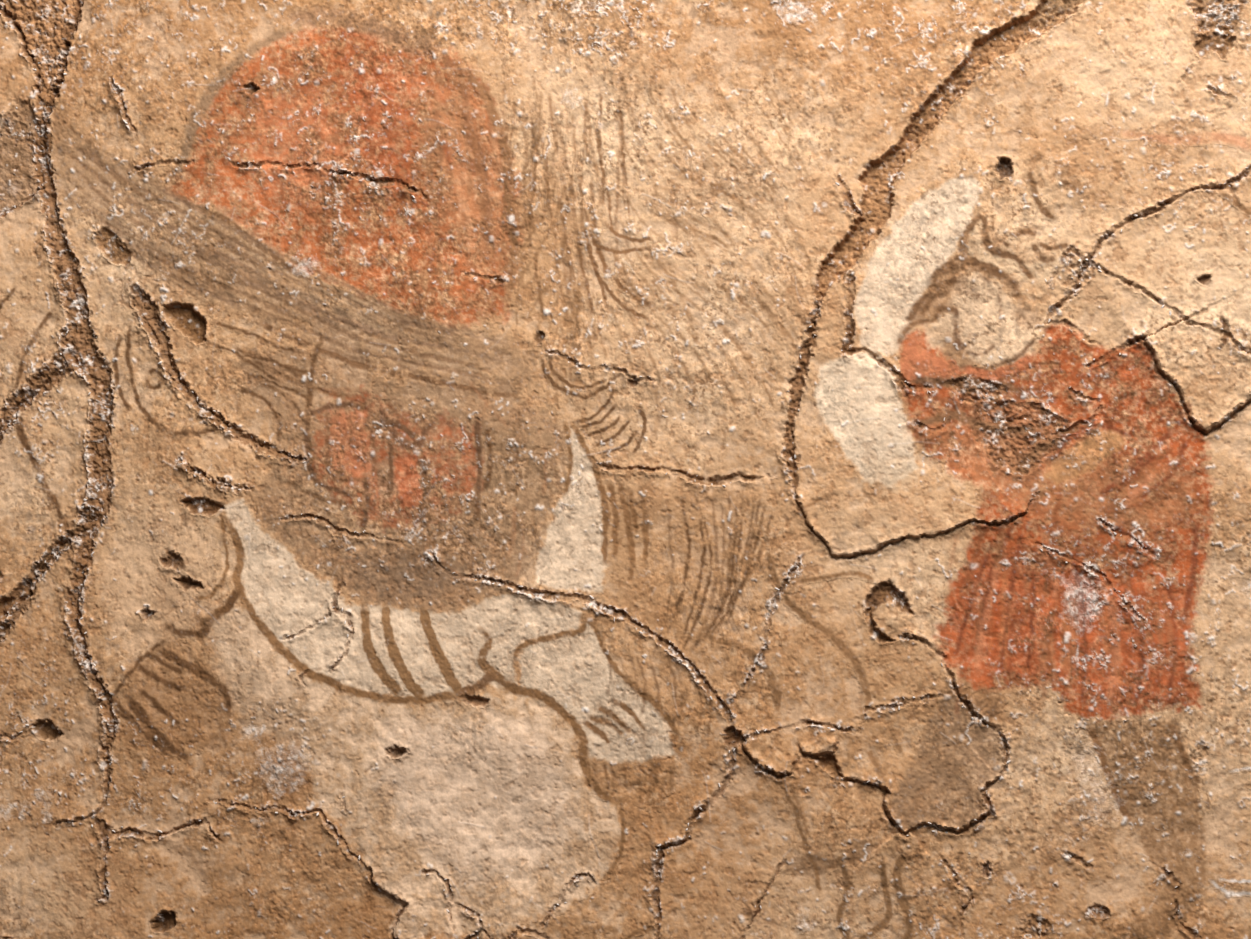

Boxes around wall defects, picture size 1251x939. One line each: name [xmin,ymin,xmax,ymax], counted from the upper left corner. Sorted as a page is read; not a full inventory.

spalling [1185,0,1250,62]
crack [1176,64,1238,101]
crack [229,160,429,200]
crack [597,0,1087,489]
spalling [160,300,207,346]
crack [1002,164,1251,443]
crack [0,0,362,903]
crack [1096,518,1159,560]
crack [1022,537,1146,623]
crack [280,513,1011,939]
crack [1061,850,1093,870]
crack [1148,860,1202,939]